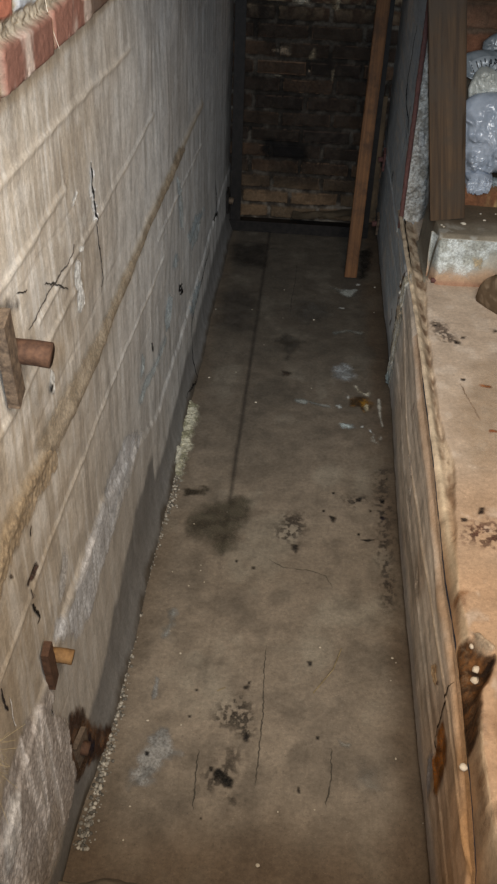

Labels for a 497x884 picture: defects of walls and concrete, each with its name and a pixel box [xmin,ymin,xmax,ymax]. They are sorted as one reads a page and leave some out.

crack [89,161,104,284]
crack [17,252,74,329]
efflorescence [175,400,198,475]
damp [189,498,248,551]
corrosion [432,723,446,794]